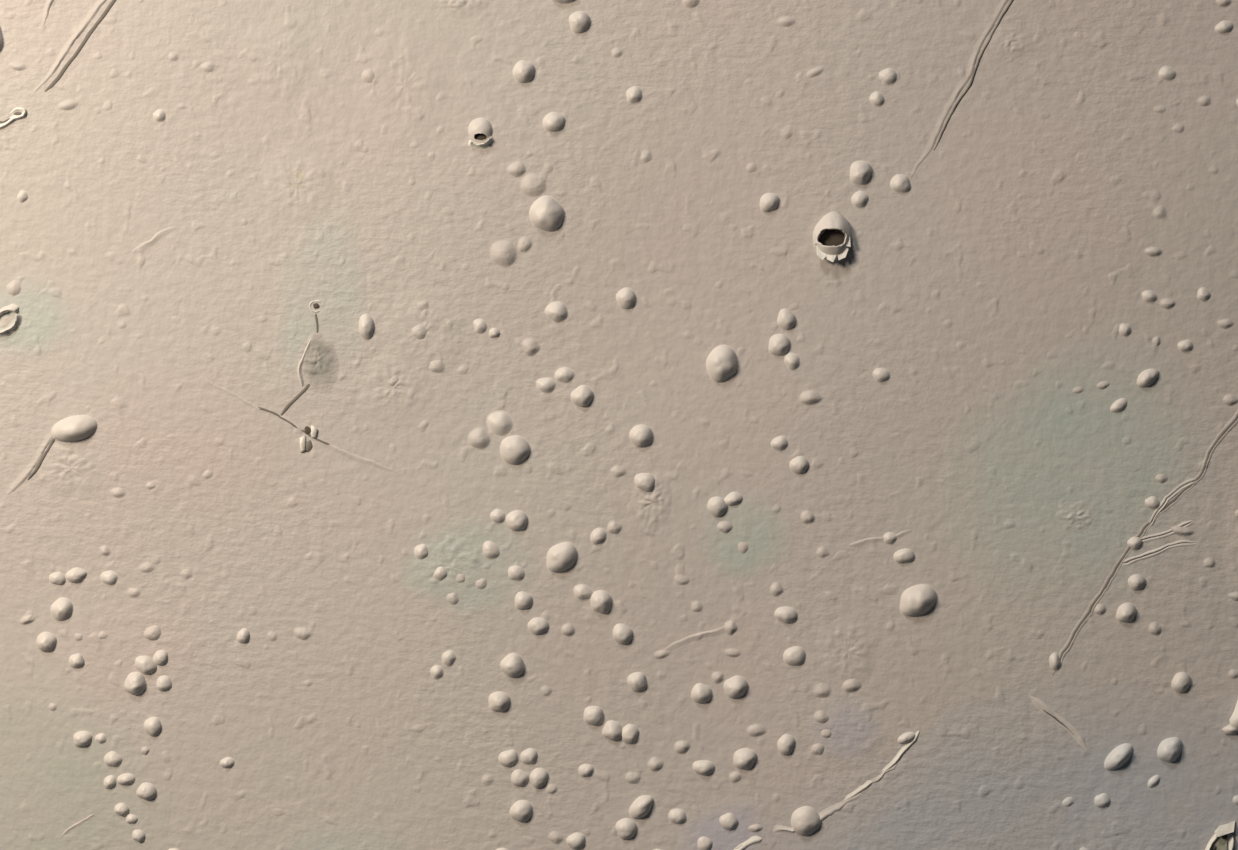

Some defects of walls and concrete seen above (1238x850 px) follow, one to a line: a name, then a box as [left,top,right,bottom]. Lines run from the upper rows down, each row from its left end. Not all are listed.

crack [33,0,117,92]
crack [909,0,1013,181]
crack [1029,409,1238,751]
peeling [1222,700,1238,735]
spalling [1205,821,1235,850]